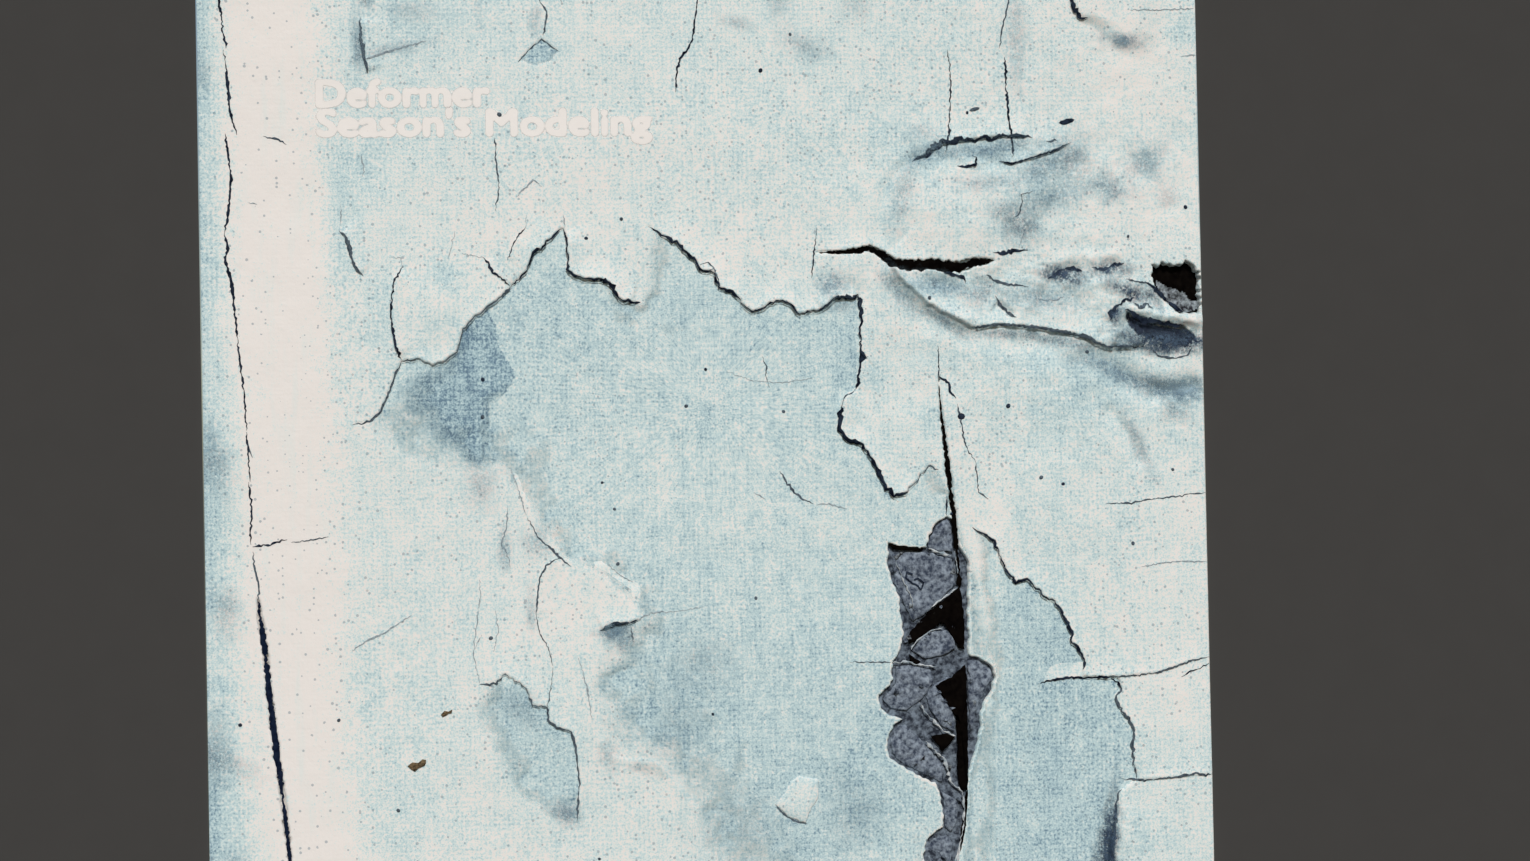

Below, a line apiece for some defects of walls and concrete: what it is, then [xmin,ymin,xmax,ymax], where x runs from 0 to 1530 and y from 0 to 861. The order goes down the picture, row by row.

crack [218,0,325,861]
peeling [353,226,1137,861]
crack [938,348,988,588]
crack [811,0,1150,348]